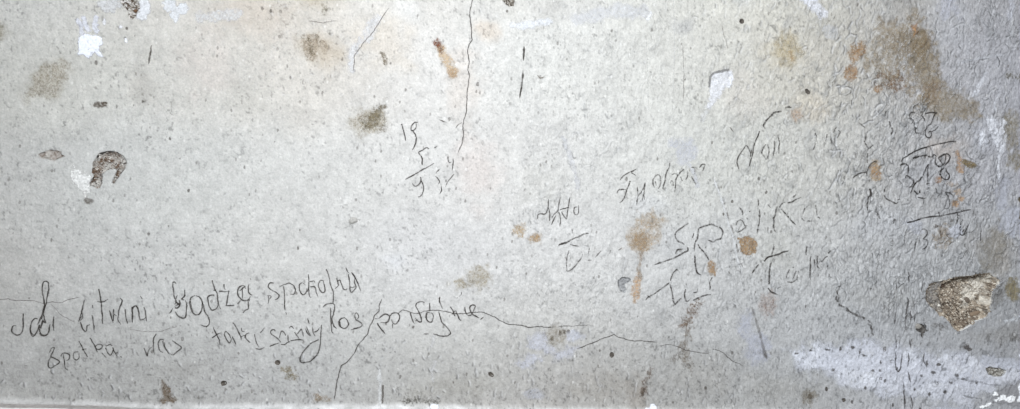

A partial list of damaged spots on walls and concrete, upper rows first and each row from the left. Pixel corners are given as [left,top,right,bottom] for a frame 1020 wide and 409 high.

crack [445,0,473,187]
leakage [864,11,981,121]
spalling [90,151,127,188]
crack [334,299,743,399]
spalling [925,273,1000,331]